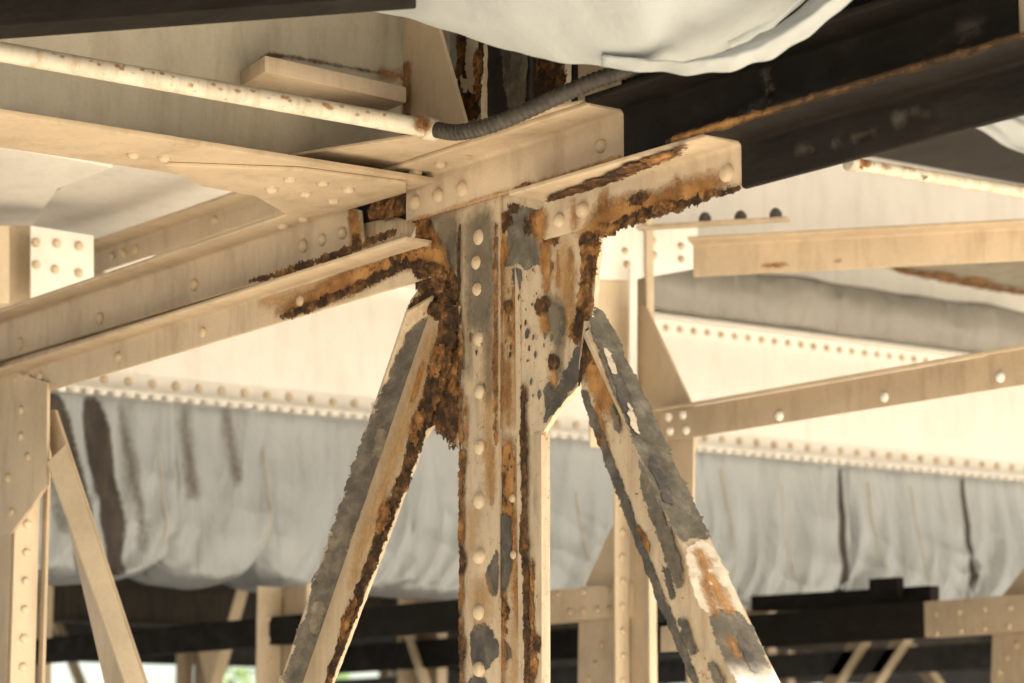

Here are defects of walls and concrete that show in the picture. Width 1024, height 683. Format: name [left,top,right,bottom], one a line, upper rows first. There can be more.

damp [50,393,143,576]
peeling [281,318,427,683]
peeling [485,441,517,598]
corrosion [249,33,1024,683]
peeling [502,205,778,683]
damp [838,467,850,587]
damp [961,478,980,593]
peeling [468,622,512,683]